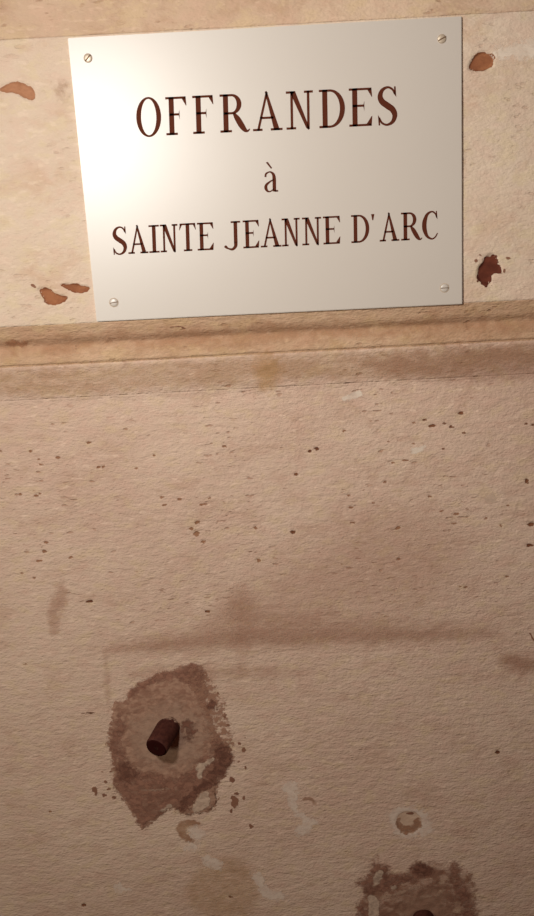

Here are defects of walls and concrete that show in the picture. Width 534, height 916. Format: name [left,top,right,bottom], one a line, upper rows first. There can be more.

spalling [469,38,534,71]
spalling [0,81,35,100]
spalling [31,283,90,305]